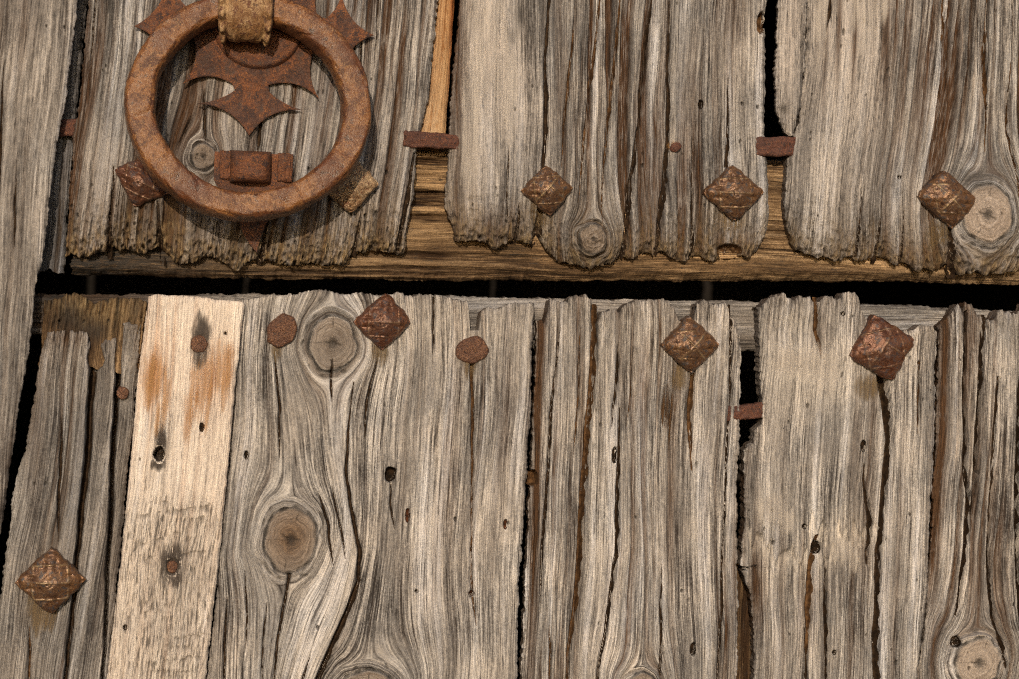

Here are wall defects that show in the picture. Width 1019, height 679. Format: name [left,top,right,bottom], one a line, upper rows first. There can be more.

crack [862,376,890,679]